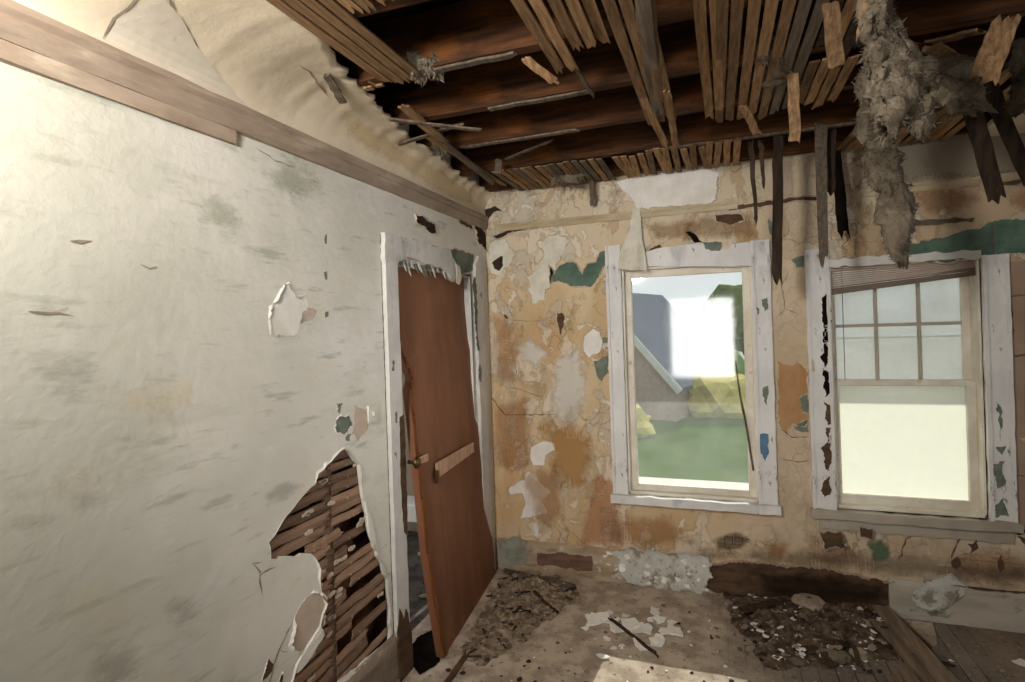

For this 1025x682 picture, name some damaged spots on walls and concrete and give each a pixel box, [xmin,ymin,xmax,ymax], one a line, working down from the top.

crack [103,0,137,38]
peeling [267,282,329,337]
peeling [472,276,482,387]
peeling [475,220,605,304]
spalling [556,312,565,336]
peeling [582,328,609,382]
peeling [616,168,817,270]
peeling [760,293,833,499]
peeling [993,401,1010,518]
spalling [261,403,393,682]
peeling [497,439,896,595]